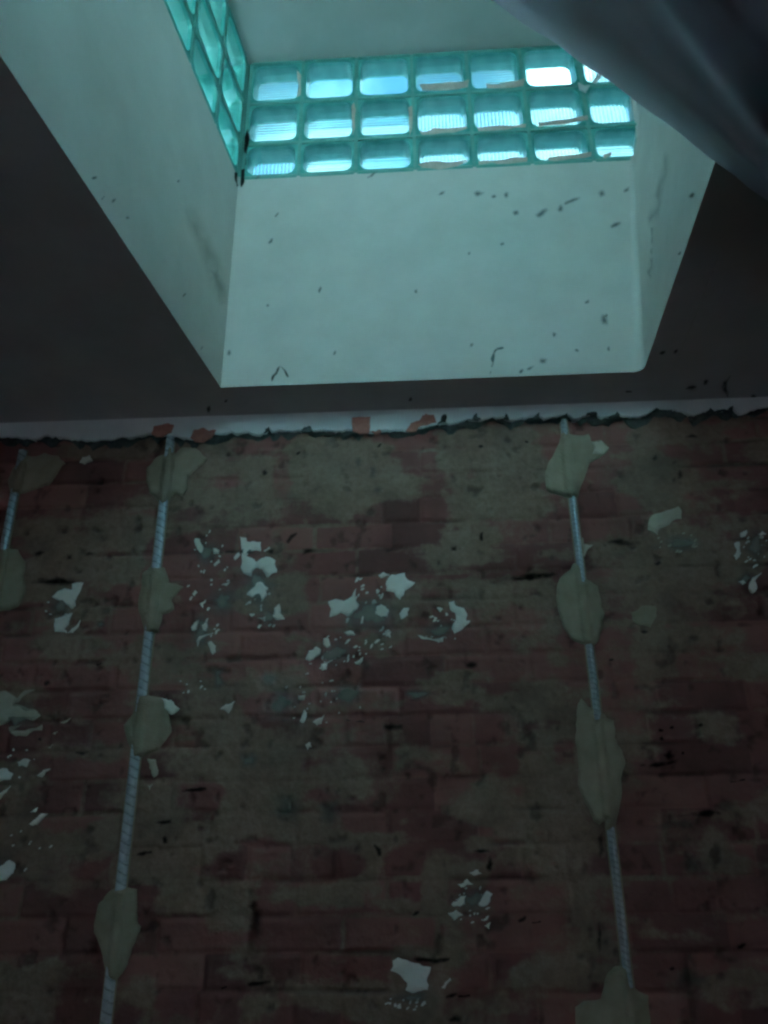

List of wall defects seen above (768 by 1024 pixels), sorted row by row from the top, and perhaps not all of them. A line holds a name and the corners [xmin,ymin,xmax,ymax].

spalling [0,395,768,464]
peeling [648,506,682,535]
peeling [234,537,277,605]
peeling [52,582,83,633]
peeling [328,572,415,636]
peeling [418,601,470,642]
peeling [306,638,331,671]
peeling [0,681,71,748]
peeling [0,758,30,799]
peeling [0,860,15,881]
peeling [448,849,492,920]
peeling [390,958,431,993]